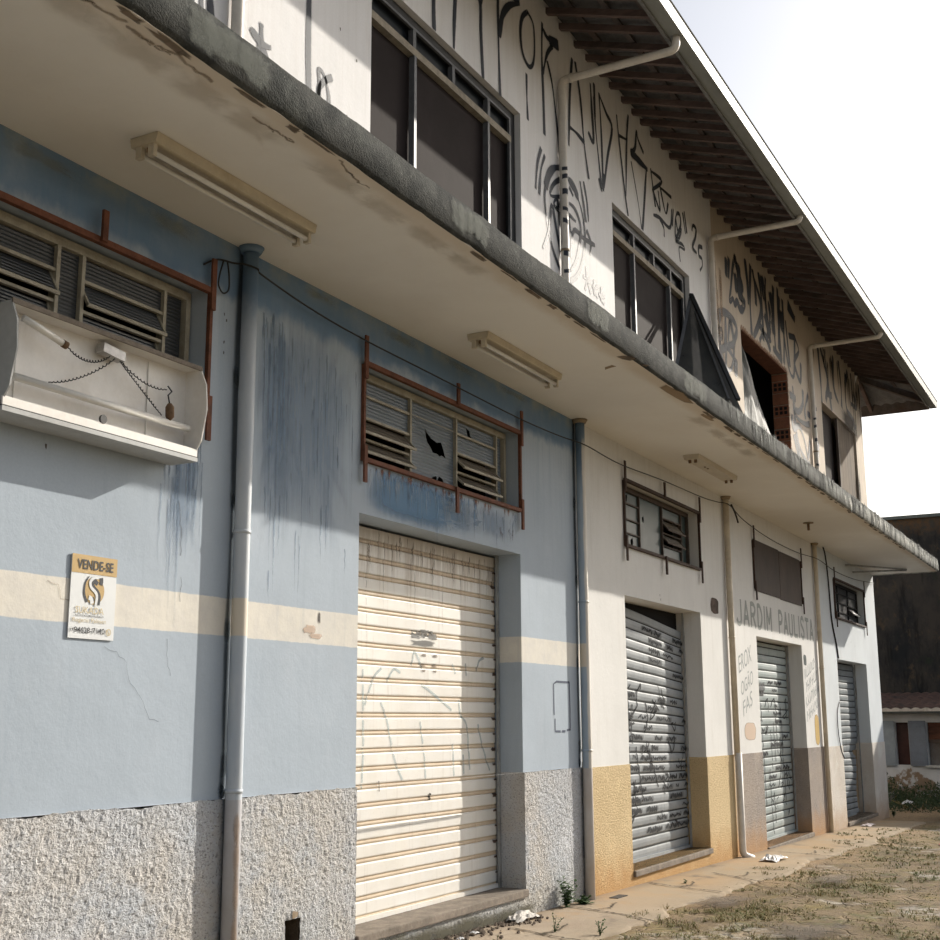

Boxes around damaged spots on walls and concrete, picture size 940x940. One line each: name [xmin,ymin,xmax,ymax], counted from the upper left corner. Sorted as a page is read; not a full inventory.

peeling [304,613,322,639]